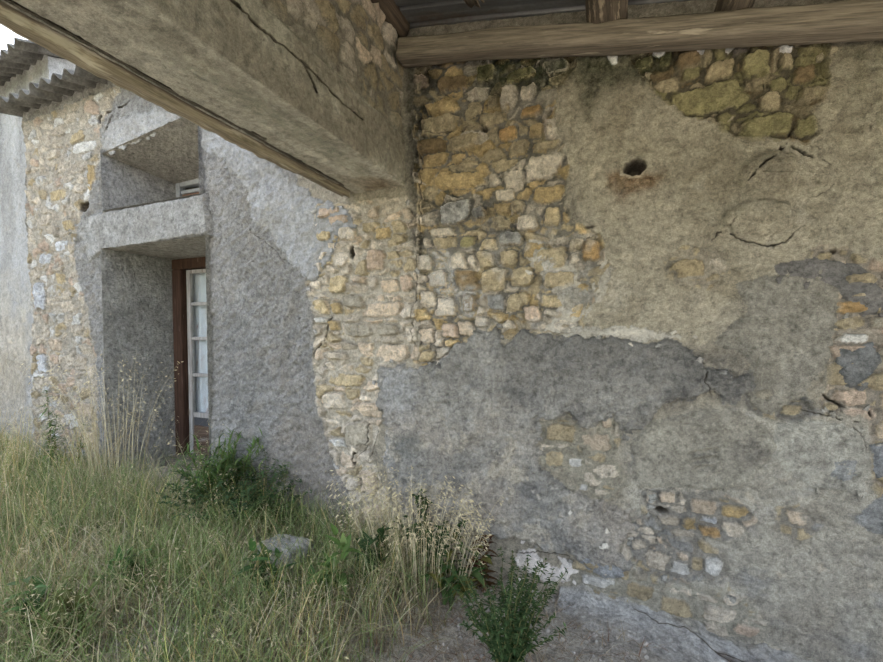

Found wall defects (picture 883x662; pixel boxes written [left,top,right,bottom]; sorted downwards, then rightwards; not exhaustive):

crack [5,0,364,186]
spalling [629,43,839,146]
crack [744,124,823,185]
spalling [0,86,180,470]
spalling [200,56,683,547]
crack [708,211,806,251]
spalling [743,243,883,499]
spalling [515,487,774,638]
crack [634,609,744,662]
spalling [771,487,829,542]